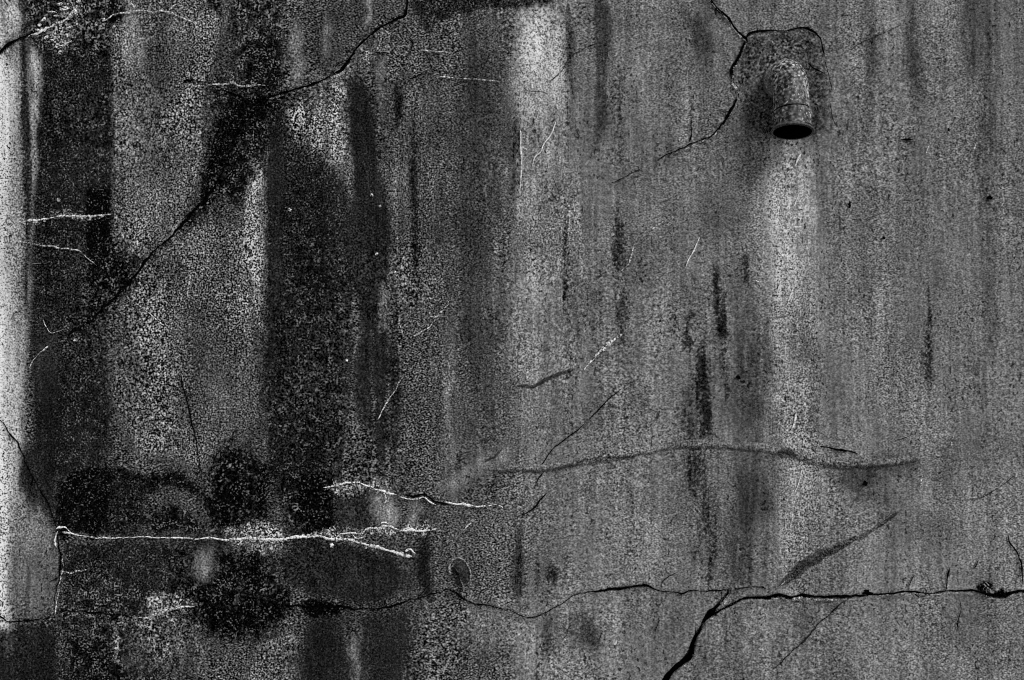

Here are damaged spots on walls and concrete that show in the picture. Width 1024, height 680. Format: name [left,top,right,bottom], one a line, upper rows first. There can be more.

crack [0,31,35,53]
crack [67,0,433,335]
leakage [595,4,626,173]
crack [611,0,835,183]
leakage [0,0,595,680]
crack [403,494,449,505]
crack [516,388,622,517]
leakage [682,148,823,621]
crack [820,446,858,454]
crack [285,535,1024,680]